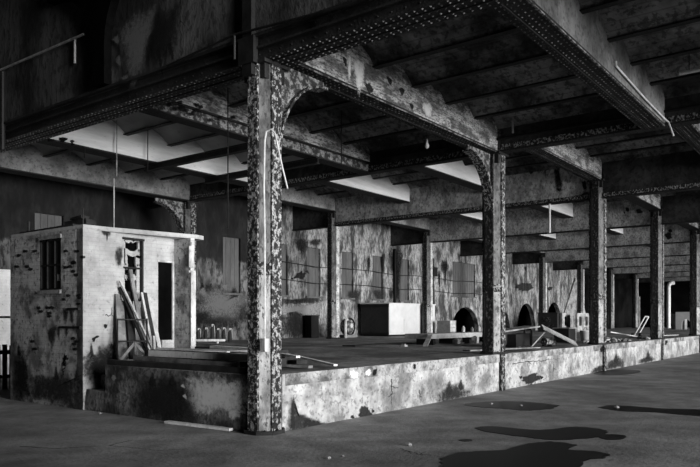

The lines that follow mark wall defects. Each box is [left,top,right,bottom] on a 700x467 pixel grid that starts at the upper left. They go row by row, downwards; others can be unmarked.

water stain [14,343,117,409]
water stain [439,380,470,401]
water stain [287,401,323,431]
spalling [351,406,374,418]